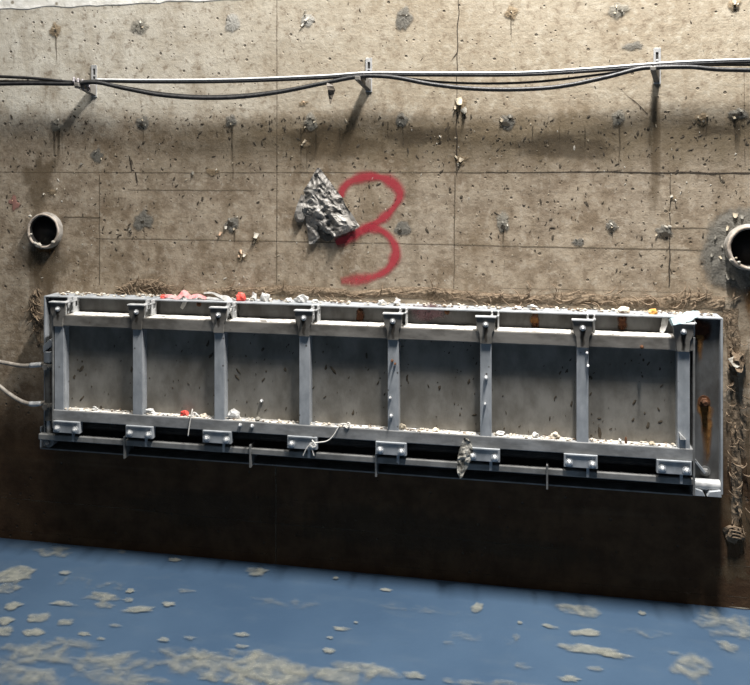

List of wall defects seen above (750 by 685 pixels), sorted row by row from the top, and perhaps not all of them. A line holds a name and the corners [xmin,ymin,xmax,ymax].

corrosion [697,403,712,451]